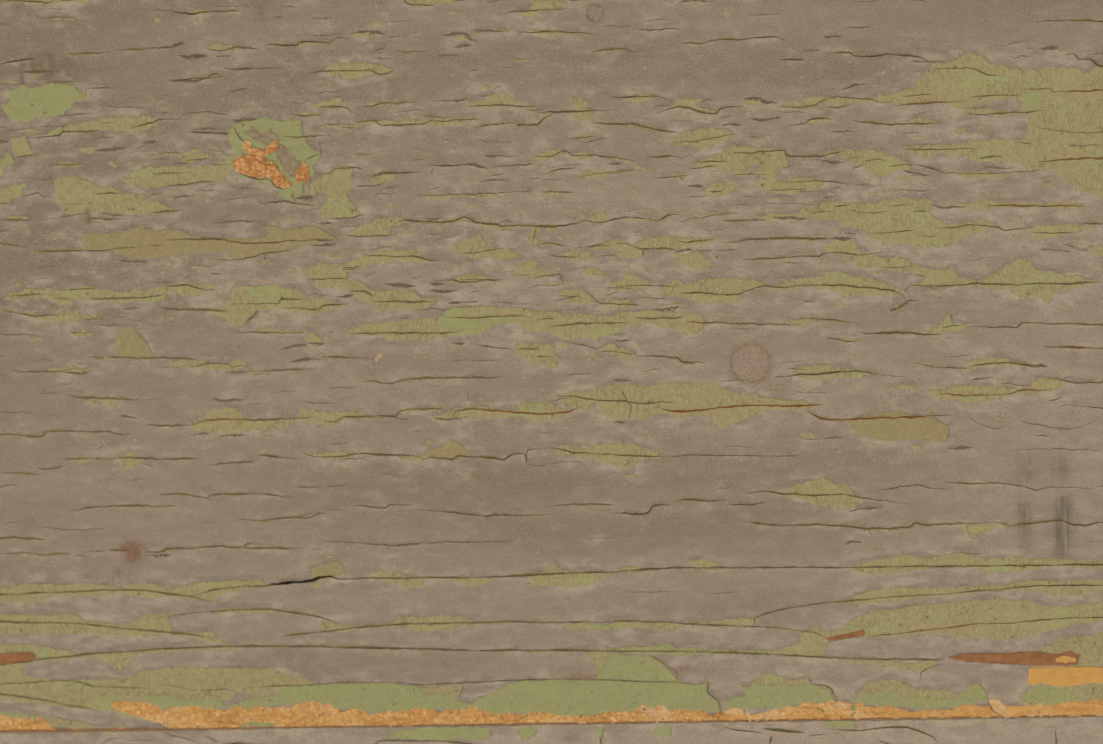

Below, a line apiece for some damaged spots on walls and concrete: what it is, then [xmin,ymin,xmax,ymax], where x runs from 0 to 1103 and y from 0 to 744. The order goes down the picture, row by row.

crack [0,0,1103,457]
crack [0,307,1103,744]
peeling [551,434,664,484]
peeling [787,478,860,512]